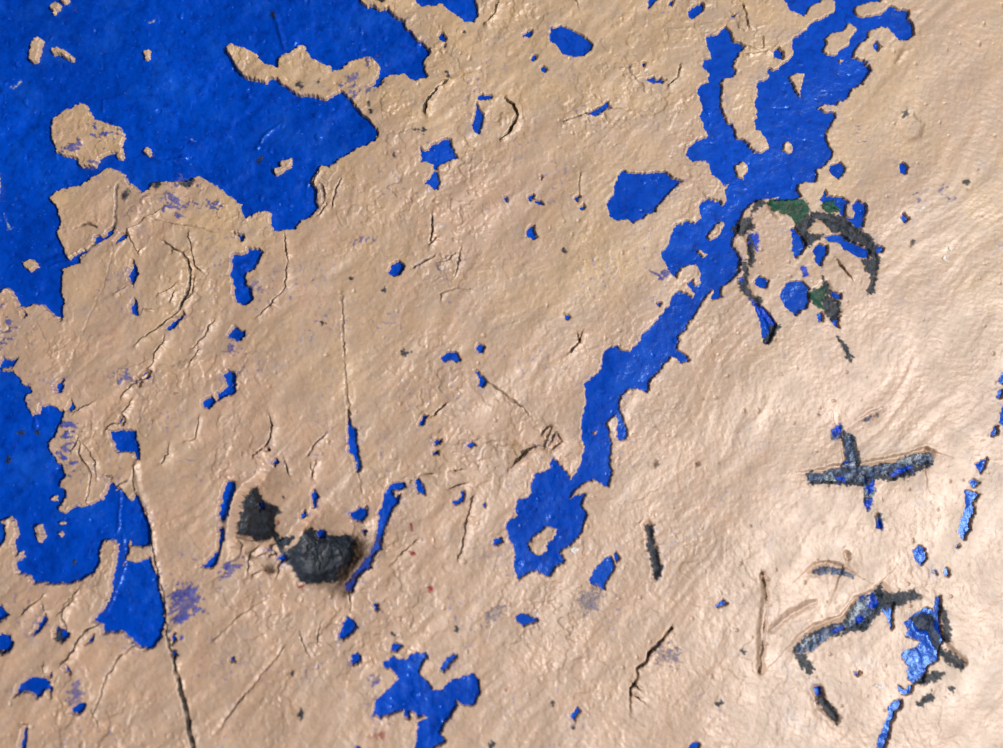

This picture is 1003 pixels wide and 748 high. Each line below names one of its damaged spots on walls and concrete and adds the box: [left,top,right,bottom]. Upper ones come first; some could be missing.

peeling [416,0,478,22]
peeling [0,0,430,320]
crack [159,235,196,327]
peeling [493,0,913,580]
peeling [0,359,178,659]
spalling [806,424,934,531]
peeling [589,553,619,589]
peeling [16,674,53,697]
crack [151,532,196,748]
peeling [373,643,480,748]
crack [630,627,672,697]
peeling [794,586,965,748]